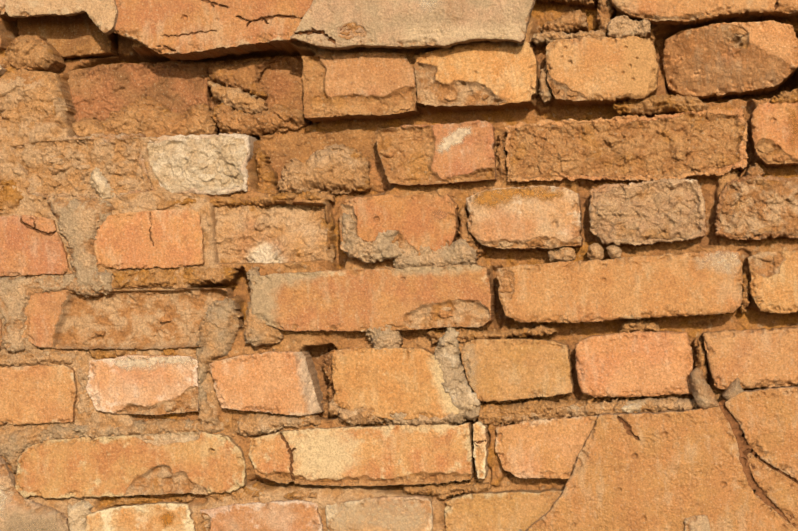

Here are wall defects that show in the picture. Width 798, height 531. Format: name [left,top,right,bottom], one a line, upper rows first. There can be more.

crack [201,0,364,44]
spalling [13,135,247,197]
spalling [375,125,496,185]
spalling [755,138,797,164]
spalling [478,236,581,249]
spalling [591,181,703,243]
spalling [720,177,798,238]
spalling [52,287,229,350]
spalling [403,299,491,329]
spalling [254,468,471,486]
flaking render [525,368,798,531]
crack [719,400,798,526]